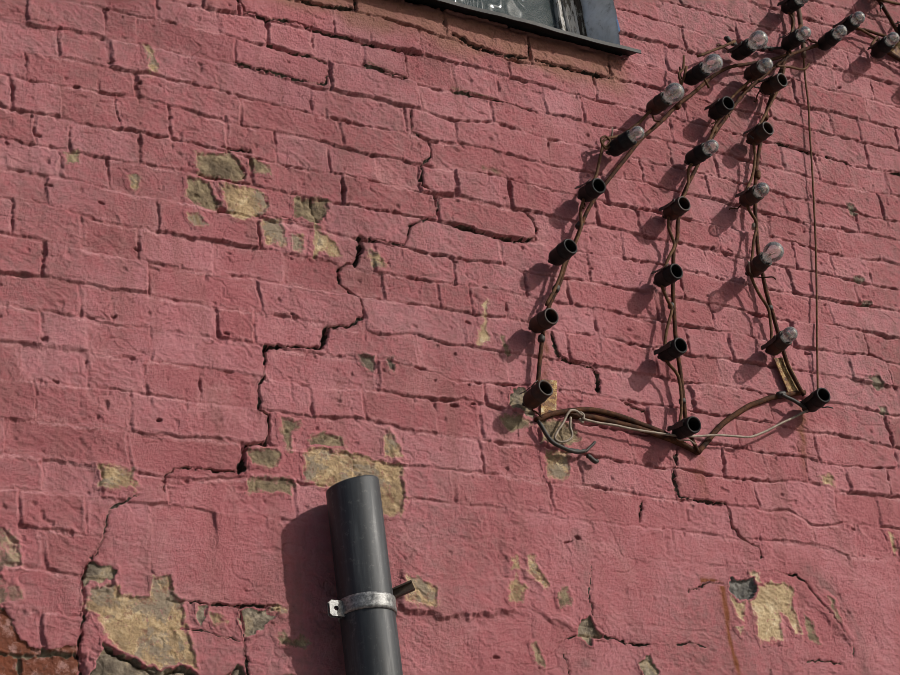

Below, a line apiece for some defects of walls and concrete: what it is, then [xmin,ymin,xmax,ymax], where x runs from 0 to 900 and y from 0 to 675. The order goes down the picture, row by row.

peeling [181,143,391,275]
crack [75,108,441,675]
peeling [0,523,315,675]
peeling [240,412,411,520]
peeling [400,569,442,615]
peeling [504,548,604,647]
crack [562,561,652,675]
crack [637,500,645,523]
spalling [637,652,661,675]
crack [671,445,856,666]
peeling [727,568,823,648]